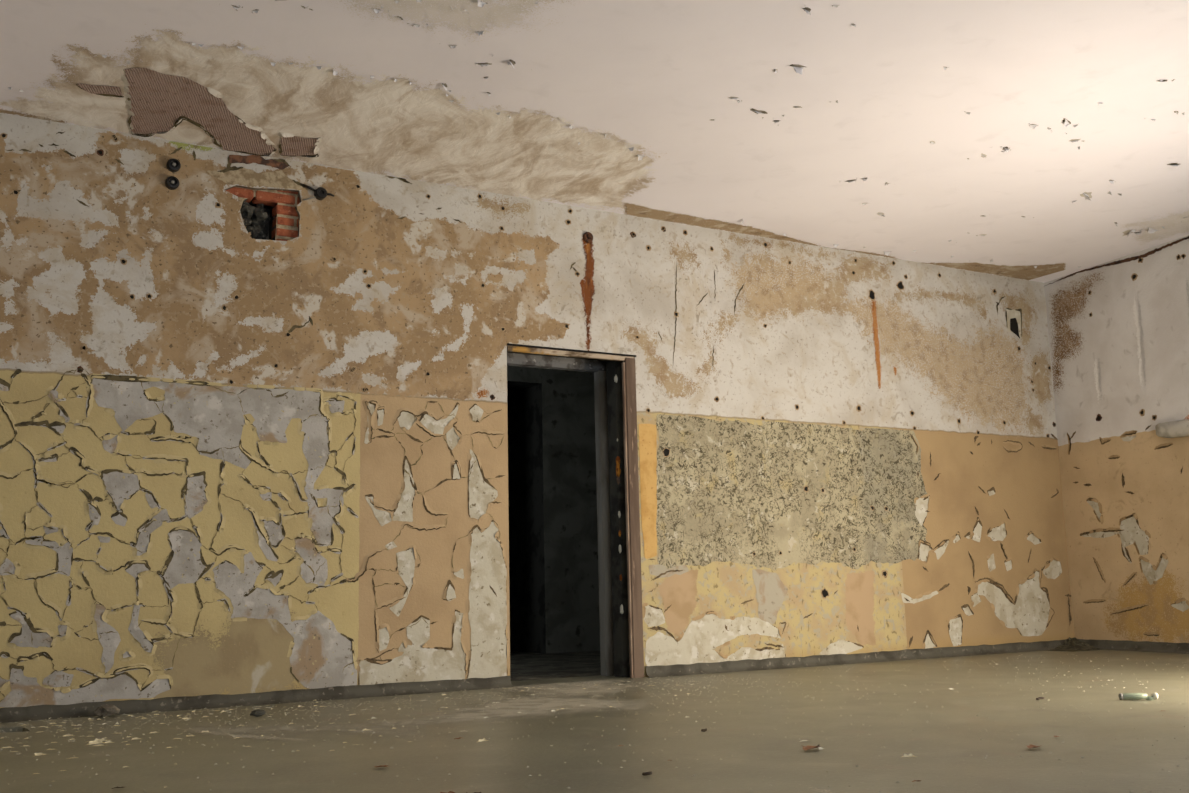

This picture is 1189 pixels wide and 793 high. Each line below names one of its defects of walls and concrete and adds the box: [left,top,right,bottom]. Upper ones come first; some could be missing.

water stain [0,29,896,327]
peeling [728,97,802,126]
peeling [1028,118,1084,149]
corrosion [580,238,596,351]
corrosion [871,300,897,389]
water stain [838,262,1106,441]
peeling [1114,210,1189,281]
peeling [0,116,570,707]
peeling [1099,409,1157,459]
peeling [1073,467,1168,586]